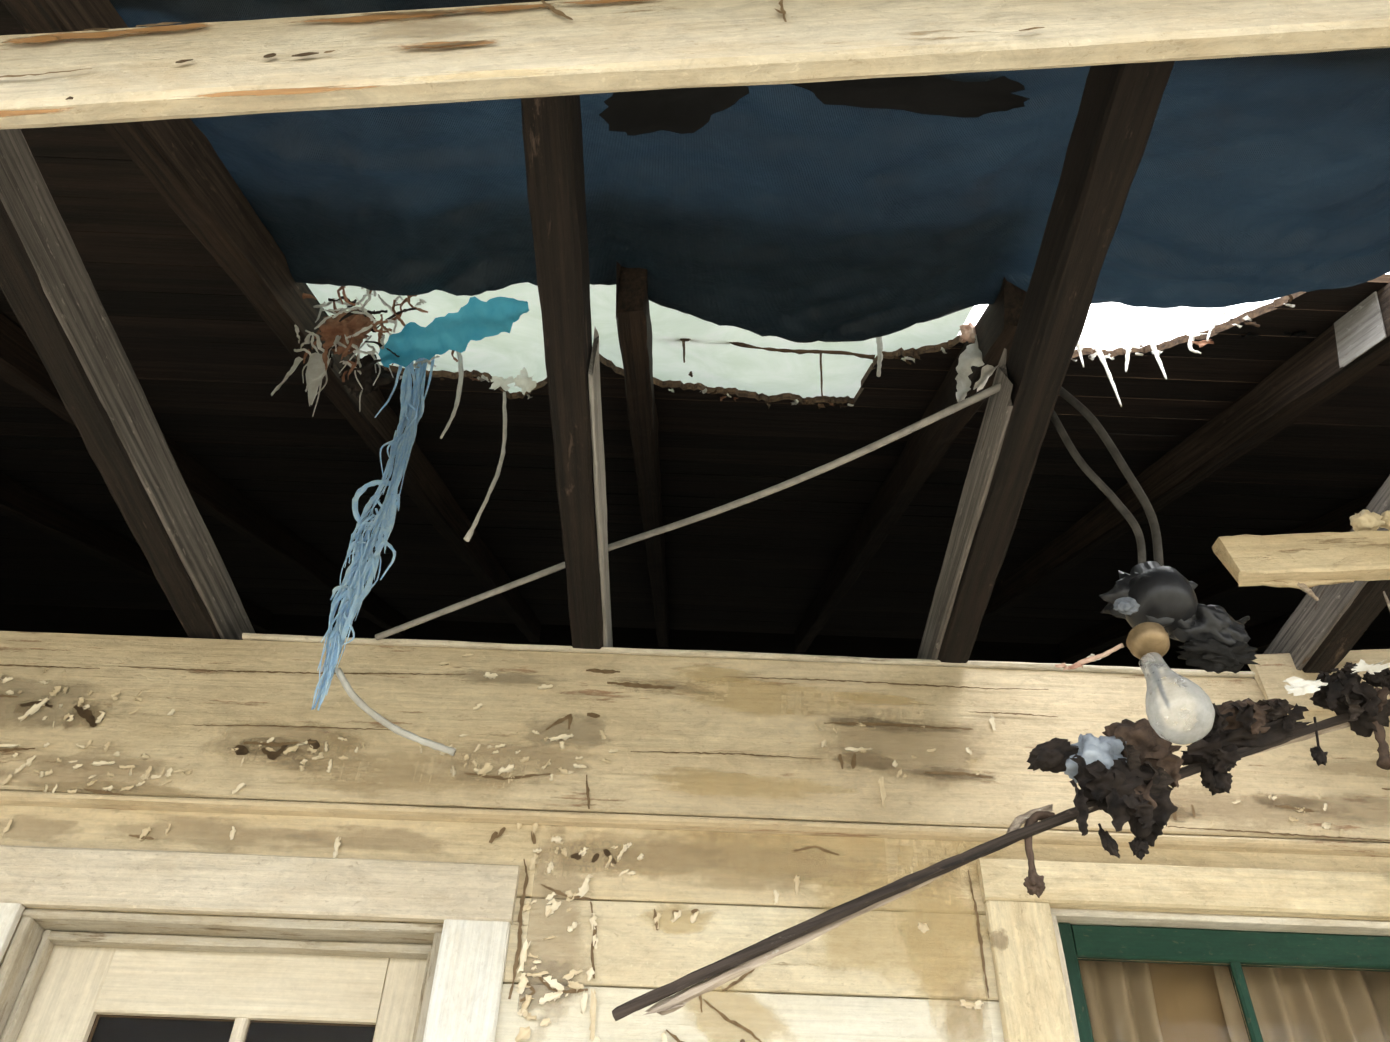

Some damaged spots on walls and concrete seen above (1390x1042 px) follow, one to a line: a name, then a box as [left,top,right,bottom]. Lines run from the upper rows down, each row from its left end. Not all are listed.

peeling [0,668,192,795]
peeling [258,737,358,773]
peeling [440,713,618,809]
peeling [129,823,171,841]
peeling [489,823,644,1042]